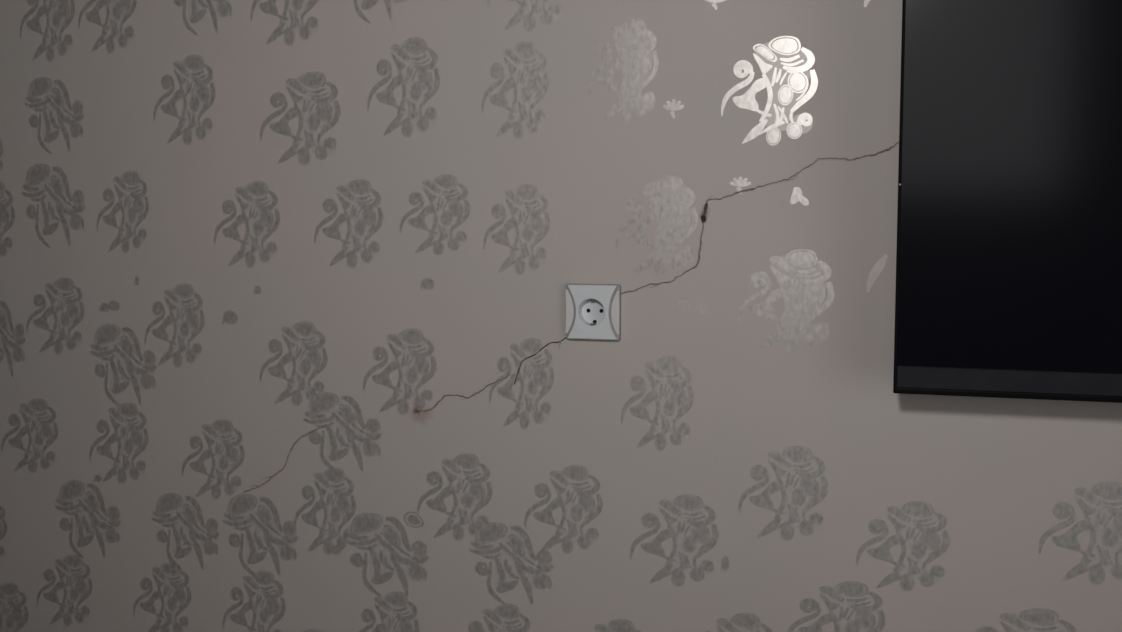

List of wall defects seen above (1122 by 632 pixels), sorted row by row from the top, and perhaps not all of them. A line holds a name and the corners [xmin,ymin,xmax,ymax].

crack [621,142,899,294]
crack [418,337,566,412]
crack [243,424,326,493]